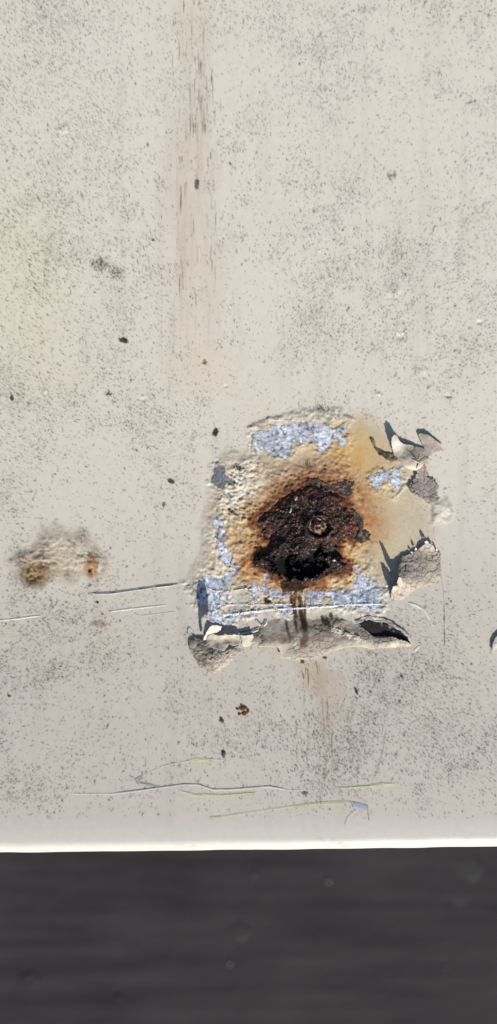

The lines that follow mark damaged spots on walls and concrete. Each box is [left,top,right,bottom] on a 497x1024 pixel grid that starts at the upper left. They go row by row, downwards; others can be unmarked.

peeling [251,421,347,461]
peeling [212,465,235,501]
peeling [305,477,356,496]
peeling [368,433,443,504]
corrosion [227,426,420,649]
corrosion [22,566,49,585]
corrosion [86,556,98,575]
peeling [186,510,442,676]